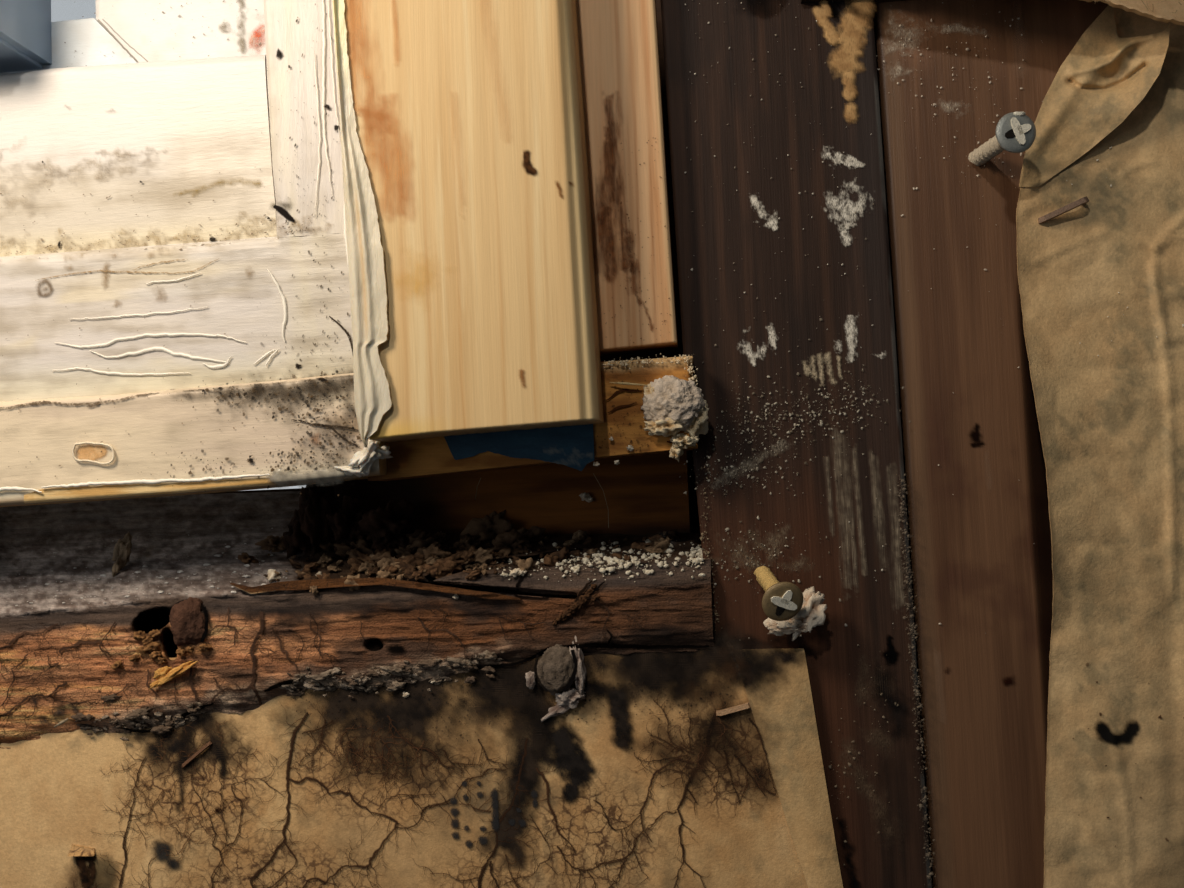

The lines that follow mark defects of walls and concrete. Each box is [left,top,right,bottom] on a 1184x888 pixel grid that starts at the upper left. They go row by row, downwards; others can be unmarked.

crack [35,259,218,281]
leakage [167,235,361,494]
crack [264,679,300,692]
crack [119,703,214,733]
mould [132,712,244,811]
mould [293,625,810,868]
mould [154,841,179,869]